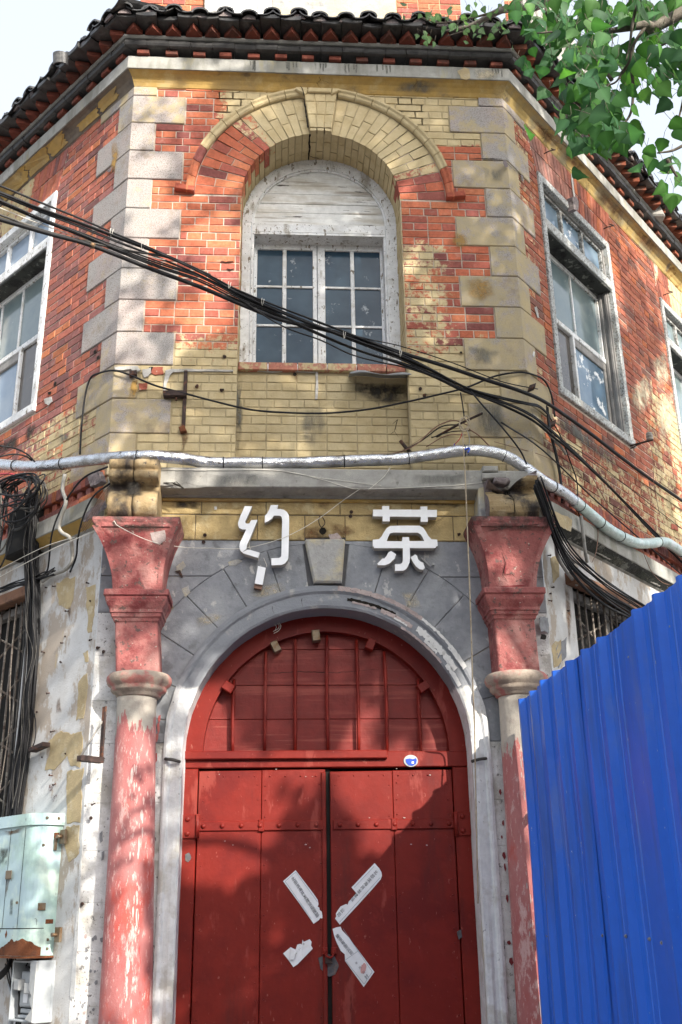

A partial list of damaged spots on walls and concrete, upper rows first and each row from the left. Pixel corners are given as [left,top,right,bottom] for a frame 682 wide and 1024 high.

crack [301,77,326,160]
peeling [150,530,166,545]
flaking render [56,577,96,633]
peeling [338,586,466,687]
flaking render [45,650,88,862]
peeling [129,752,148,859]
rust [0,930,41,956]
peeling [125,945,155,1024]